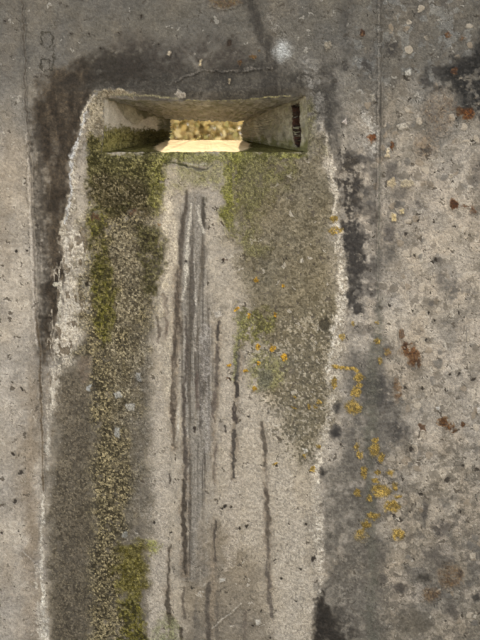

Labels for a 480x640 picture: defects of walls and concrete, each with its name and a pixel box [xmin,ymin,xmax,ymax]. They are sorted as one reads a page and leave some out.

leakage [51,0,293,102]
crack [111,65,292,102]
leakage [417,25,480,129]
corrosion [412,85,476,161]
leakage [467,149,480,191]
leakage [26,17,97,472]
leakage [427,253,476,308]
leakage [142,0,463,640]
corrosion [383,327,423,369]
corrosion [435,415,466,435]